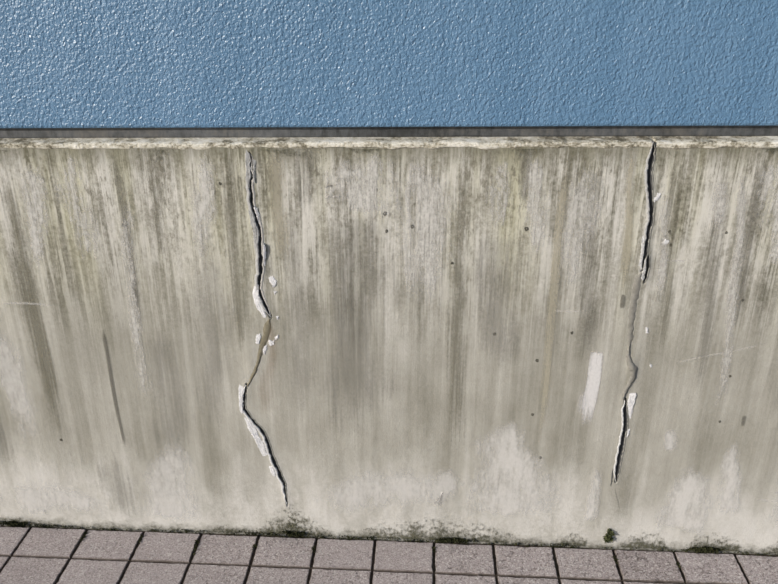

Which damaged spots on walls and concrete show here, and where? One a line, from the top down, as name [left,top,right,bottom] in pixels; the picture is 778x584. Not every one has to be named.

damp [6,170,55,408]
damp [193,162,214,246]
crack [238,150,288,505]
damp [326,156,393,212]
damp [403,167,451,289]
damp [527,161,546,251]
damp [542,174,598,412]
crack [610,141,669,509]
damp [722,184,744,386]
damp [761,166,778,262]
damp [336,473,455,507]
damp [473,426,549,516]